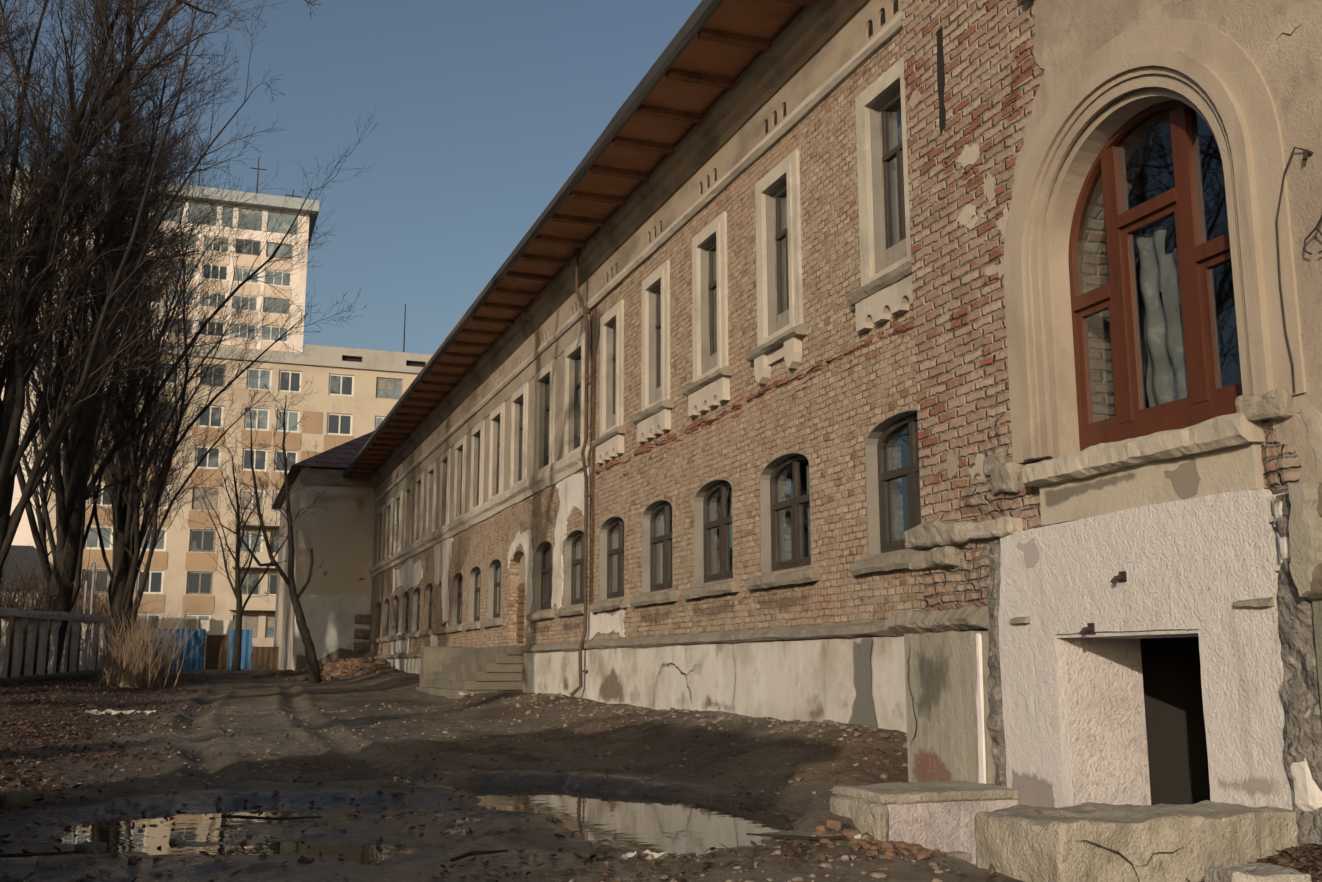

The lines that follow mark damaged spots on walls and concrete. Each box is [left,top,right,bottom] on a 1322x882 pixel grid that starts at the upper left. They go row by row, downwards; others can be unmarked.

spalling [1262,405,1322,847]
crack [653,661,696,704]
water stain [919,659,944,708]